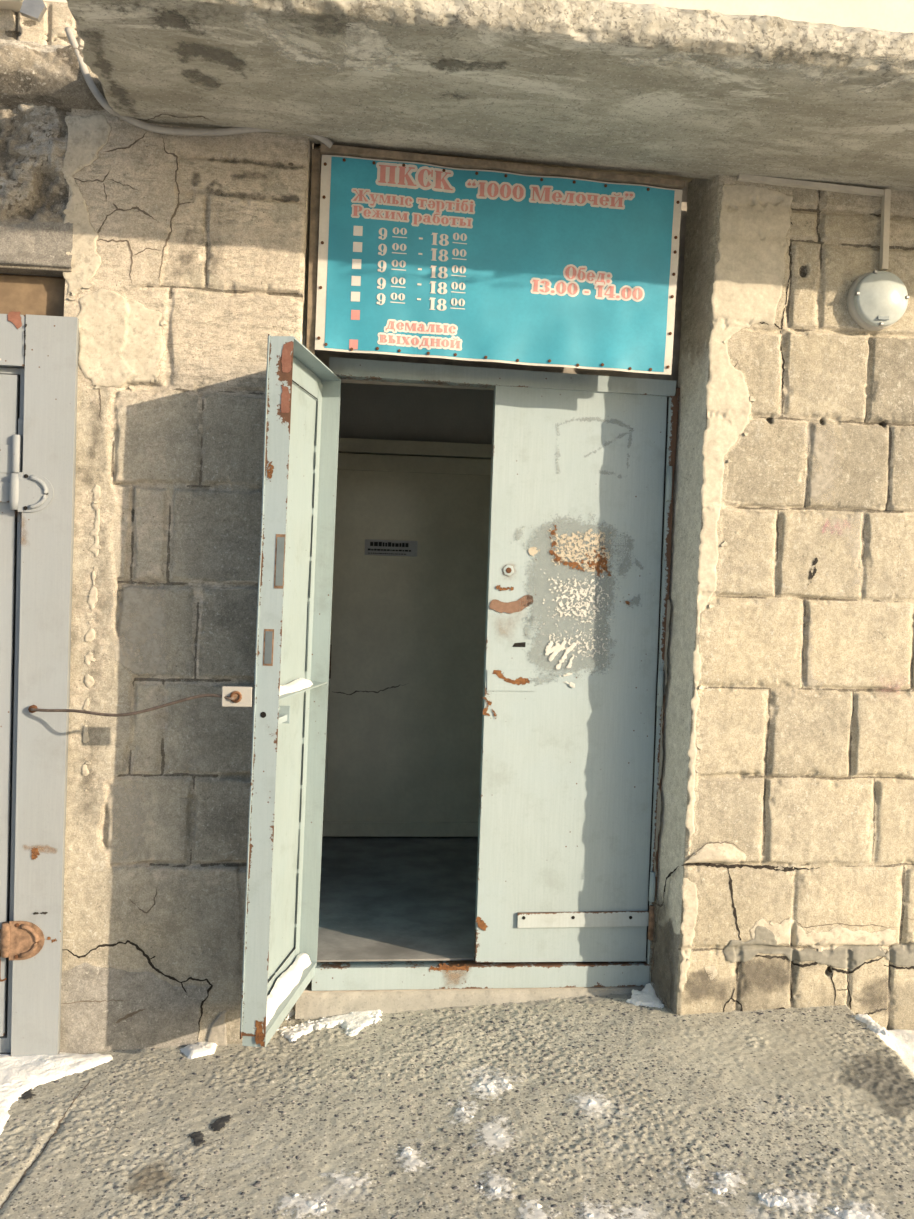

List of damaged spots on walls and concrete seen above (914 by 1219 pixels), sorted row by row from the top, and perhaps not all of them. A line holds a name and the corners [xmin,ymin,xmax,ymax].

crack [74,114,215,287]
rust [490,585,533,614]
peeling [539,524,616,688]
crack [335,684,406,695]
rust [493,670,530,685]
crack [130,887,157,914]
crack [658,863,914,1015]
crack [62,940,213,1040]